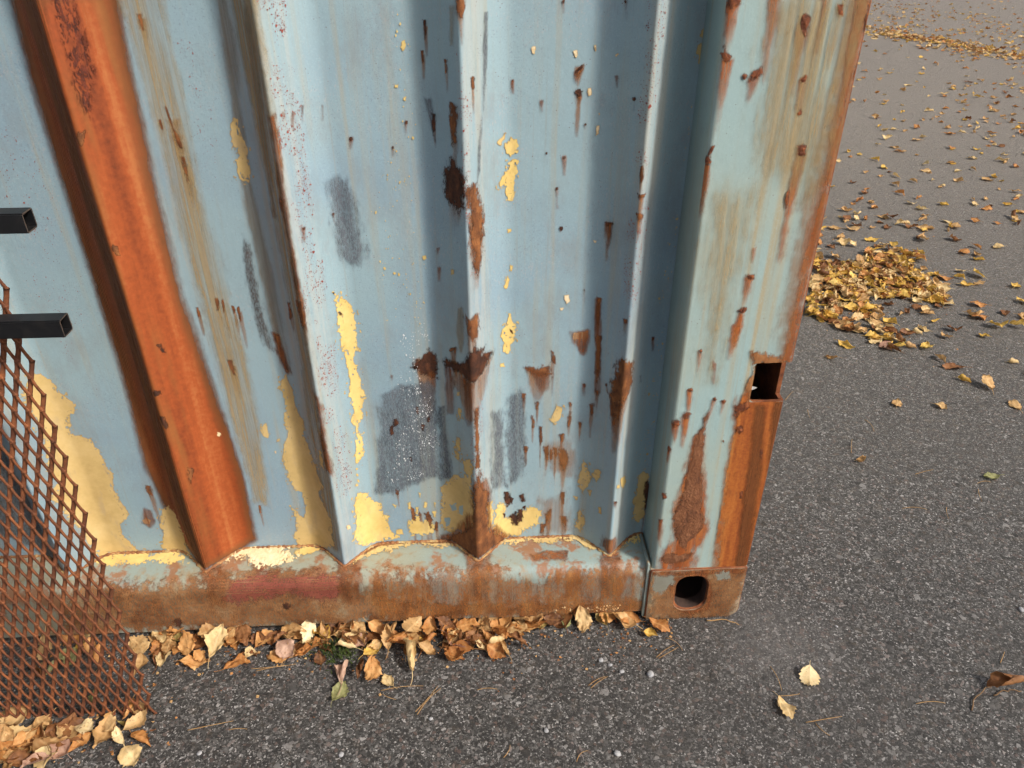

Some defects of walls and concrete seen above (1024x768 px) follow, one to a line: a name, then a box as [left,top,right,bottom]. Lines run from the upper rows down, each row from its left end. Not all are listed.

peeling [229,117,254,185]
peeling [496,132,520,204]
peeling [21,370,193,567]
peeling [225,372,334,569]
peeling [332,291,475,564]
rust [11,0,871,635]
peeling [499,312,519,367]
peeling [487,459,602,552]